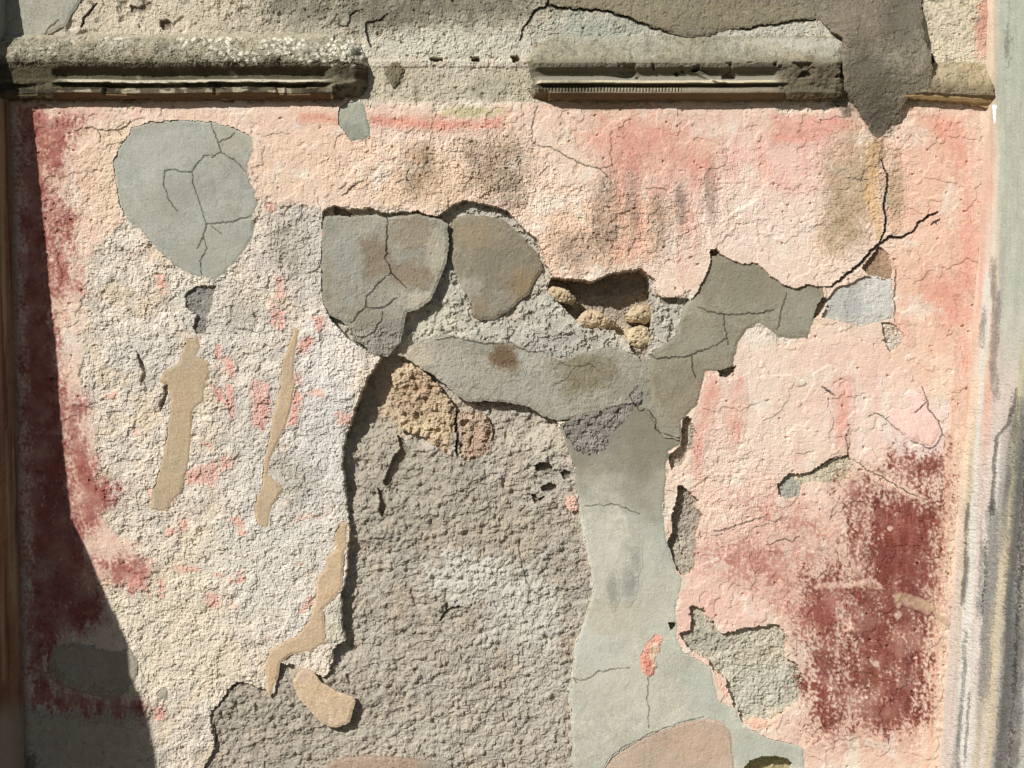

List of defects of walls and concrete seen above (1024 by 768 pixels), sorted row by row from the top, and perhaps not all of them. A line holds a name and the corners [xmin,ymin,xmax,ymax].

crack [520,4,667,40]
crack [163,123,250,275]
crack [825,160,940,287]
peeling [185,286,274,434]
crack [650,293,787,377]
peeling [182,452,234,490]
spalling [205,202,688,768]
spalling [668,417,693,469]
spalling [667,485,703,575]
peeling [679,389,964,754]